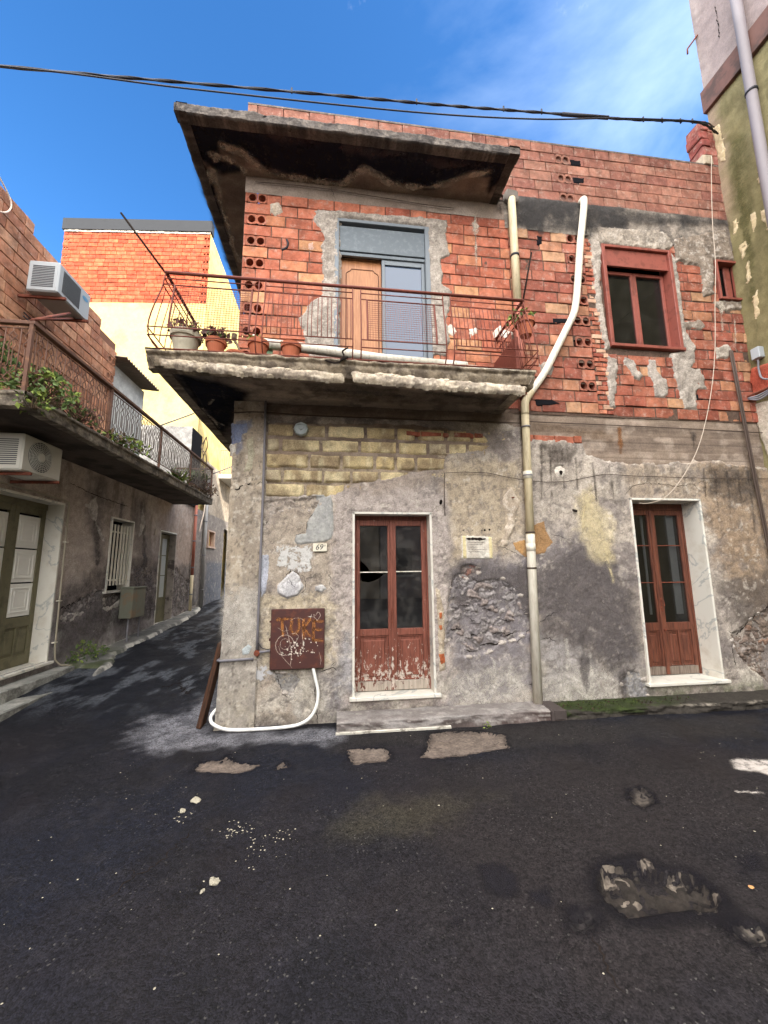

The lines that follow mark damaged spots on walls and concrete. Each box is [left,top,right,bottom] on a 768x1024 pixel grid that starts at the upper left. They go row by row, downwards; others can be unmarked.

spalling [159,358,559,406]
flaking render [264,494,322,524]
flaking render [436,565,530,671]
leakage [542,471,638,701]
flaking render [729,611,768,682]